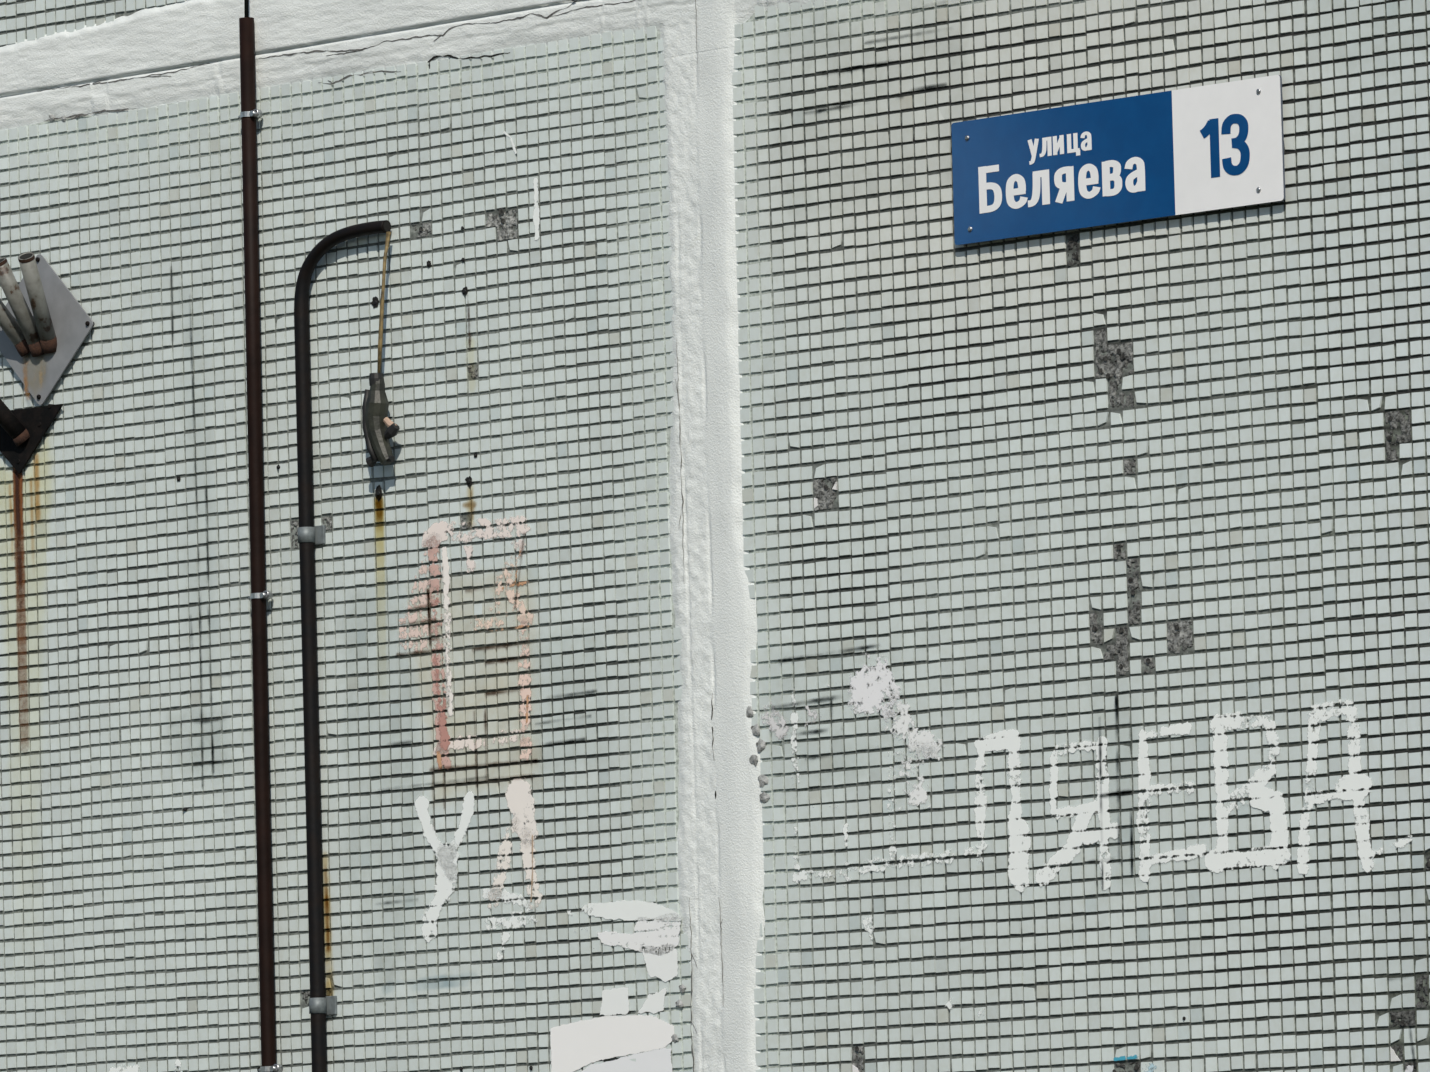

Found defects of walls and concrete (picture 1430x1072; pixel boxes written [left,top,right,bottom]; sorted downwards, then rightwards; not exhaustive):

peeling [486,208,518,241]
peeling [1067,233,1080,266]
peeling [1095,329,1134,410]
peeling [1385,410,1411,461]
corrosion [13,467,26,703]
peeling [1090,543,1193,676]
peeling [1390,975,1429,1027]
peeling [1113,1062,1140,1072]
peeling [1390,1045,1417,1072]